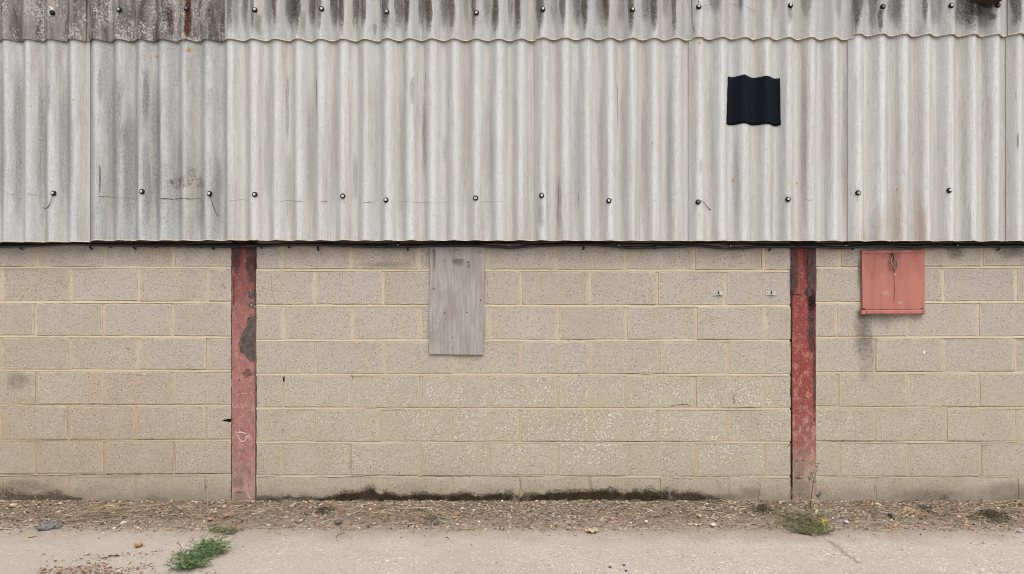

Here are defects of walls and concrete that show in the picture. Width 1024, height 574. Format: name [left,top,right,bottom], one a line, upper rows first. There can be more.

corrosion [168,0,192,36]
damp [272,0,315,26]
damp [330,0,366,25]
damp [381,0,433,27]
damp [852,0,862,27]
peeling [231,241,256,362]